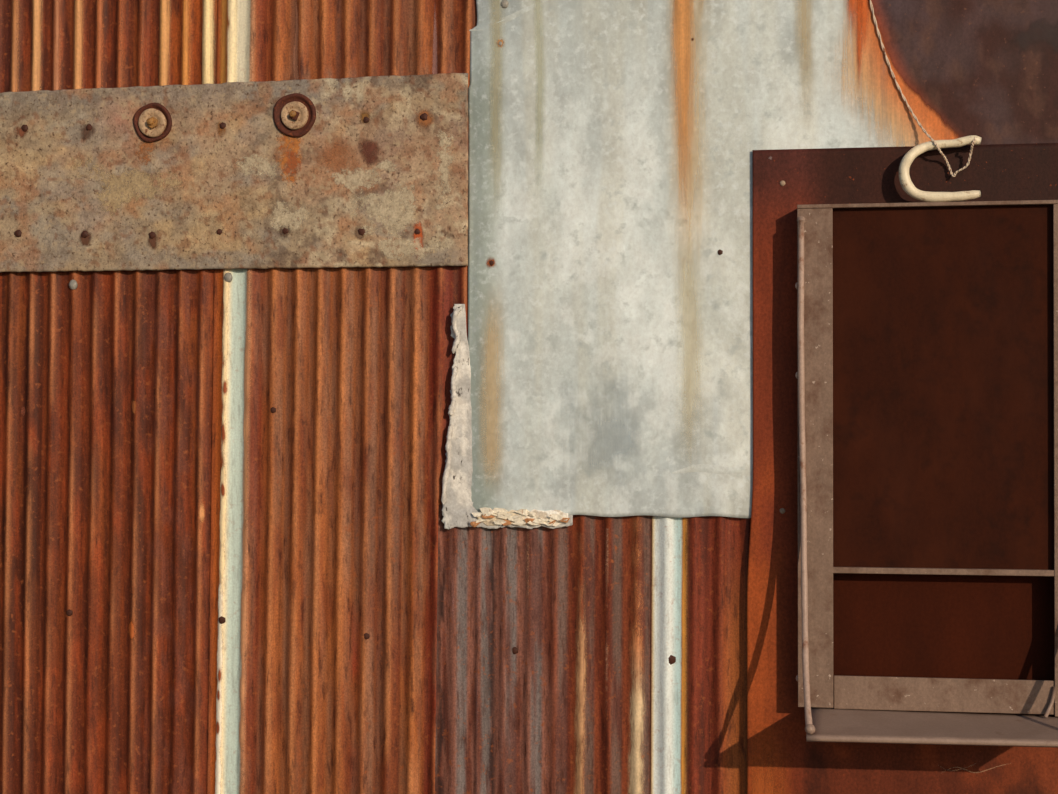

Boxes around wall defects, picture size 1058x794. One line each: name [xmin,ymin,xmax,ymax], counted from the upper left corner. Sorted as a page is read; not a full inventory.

rust [674,0,690,153]
rust [848,0,1058,146]
rust [277,133,301,181]
rust [360,140,377,165]
peeling [470,507,570,527]